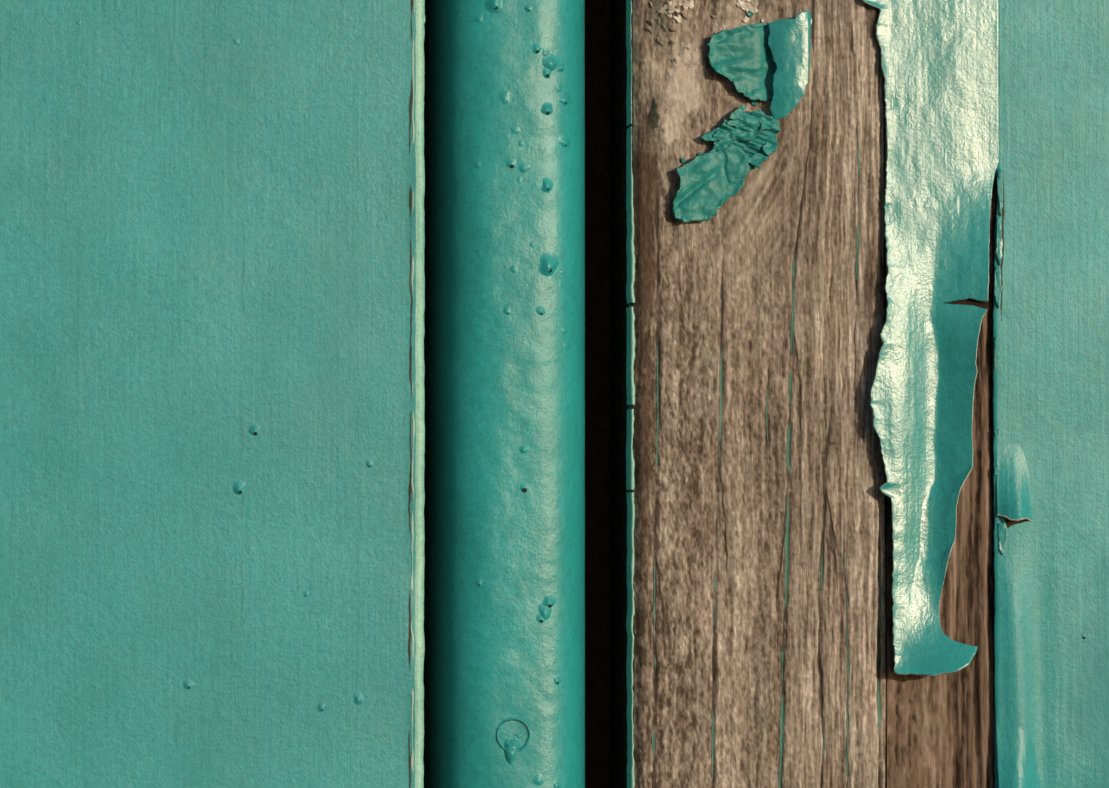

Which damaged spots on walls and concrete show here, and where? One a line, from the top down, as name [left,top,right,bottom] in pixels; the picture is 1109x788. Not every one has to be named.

peeling [658,0,695,23]
peeling [672,0,812,223]
peeling [862,0,1005,676]